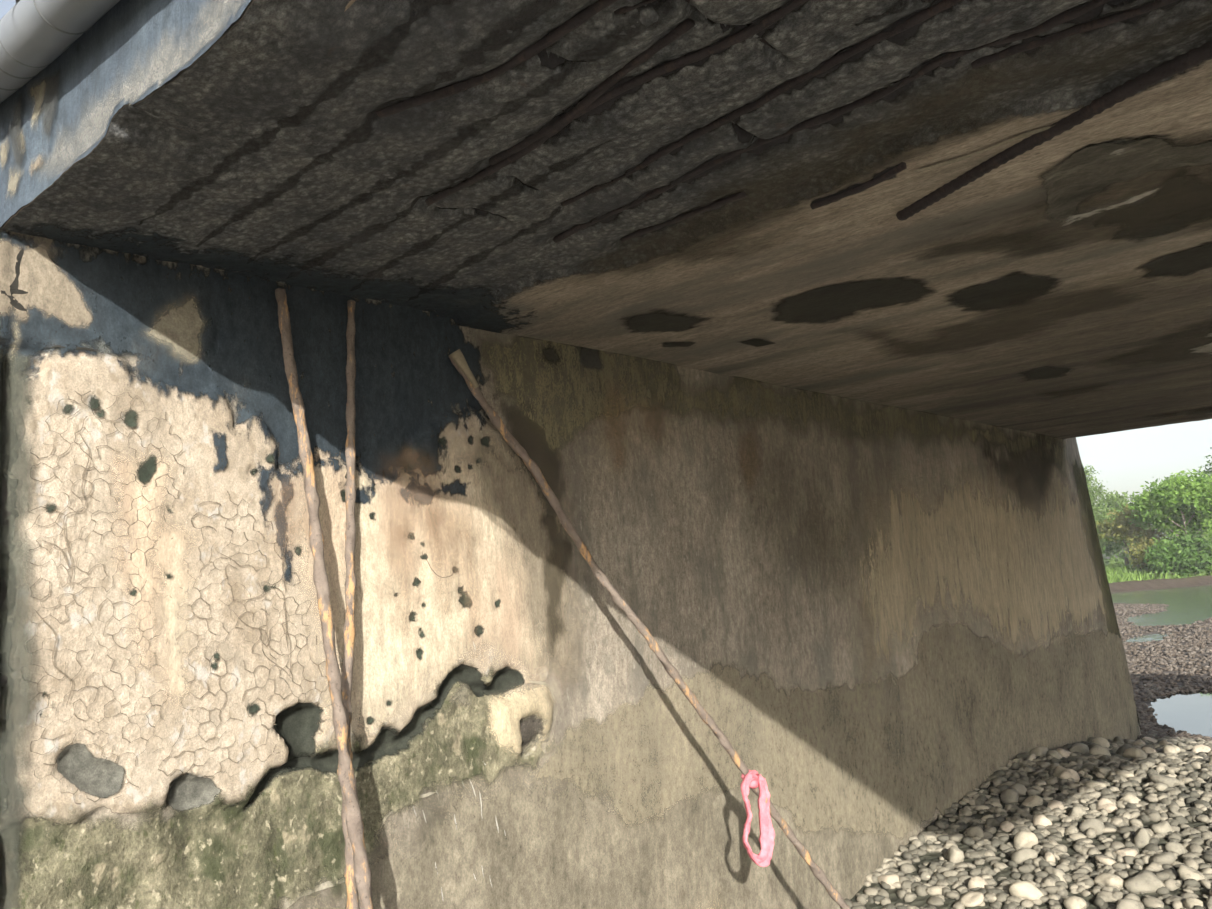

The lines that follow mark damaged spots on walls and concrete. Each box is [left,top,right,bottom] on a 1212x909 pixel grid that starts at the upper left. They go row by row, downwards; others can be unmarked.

leakage [1068,135,1207,158]
spalling [0,0,1212,452]
leakage [924,164,1212,259]
leakage [1139,243,1212,278]
leakage [577,346,602,370]
leakage [625,310,710,347]
leakage [741,339,775,347]
leakage [772,272,1143,356]
crack [0,338,385,804]
leakage [0,230,491,909]
peeling [12,350,555,909]
leakage [302,376,1139,909]